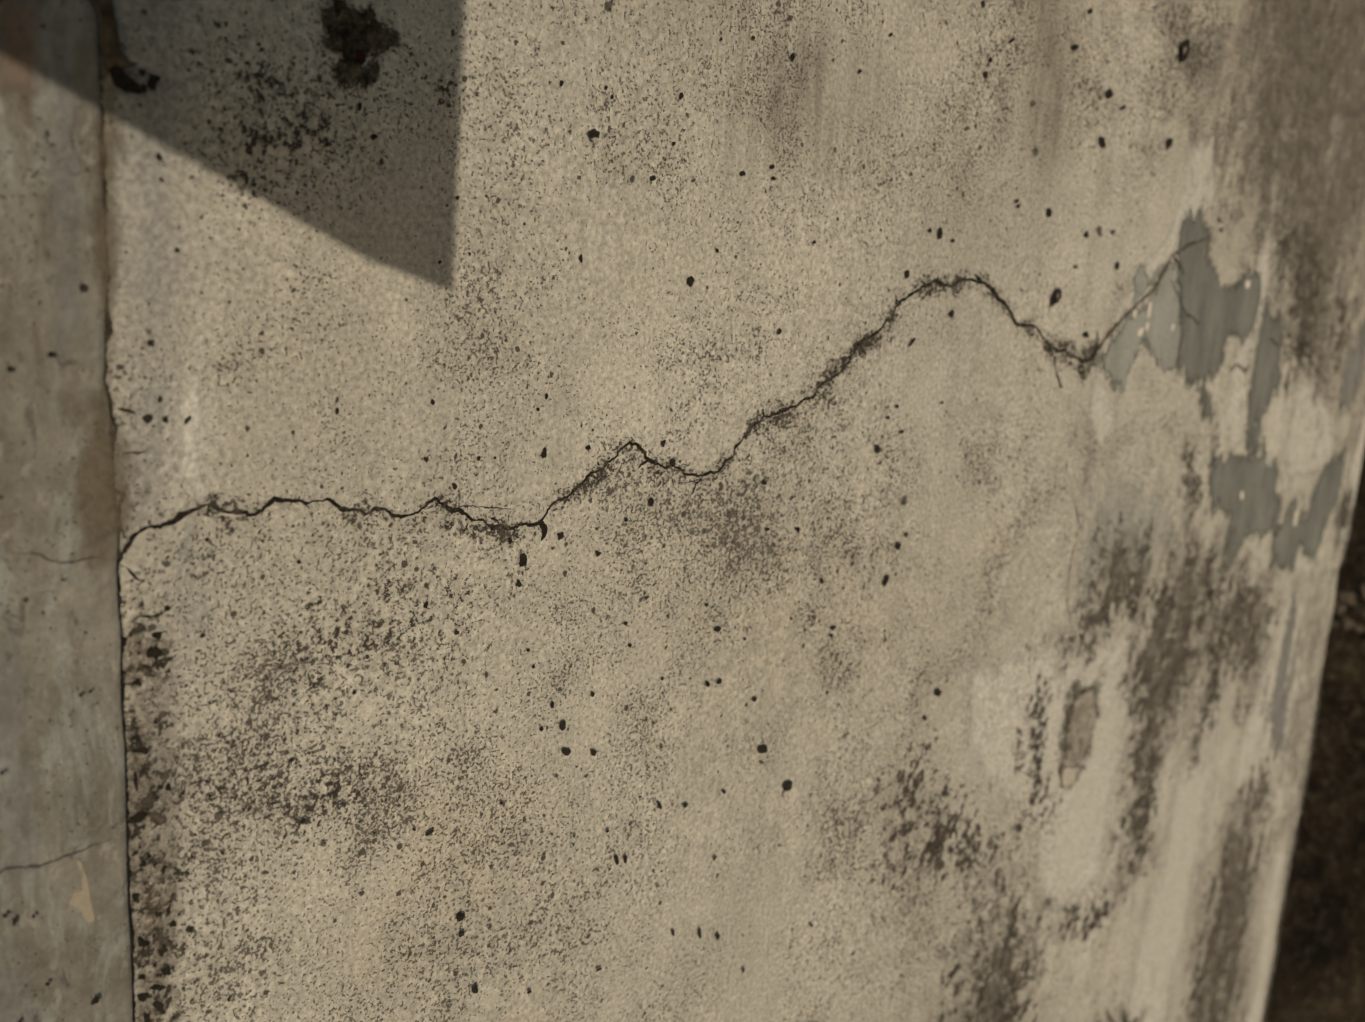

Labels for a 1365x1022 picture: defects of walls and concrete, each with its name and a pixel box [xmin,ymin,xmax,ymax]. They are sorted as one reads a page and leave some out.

crack [99,70,107,208]
crack [0,237,1209,1022]
damp [1089,371,1115,447]
damp [858,409,1365,1022]
peeling [1097,208,1347,767]
damp [1111,0,1365,480]